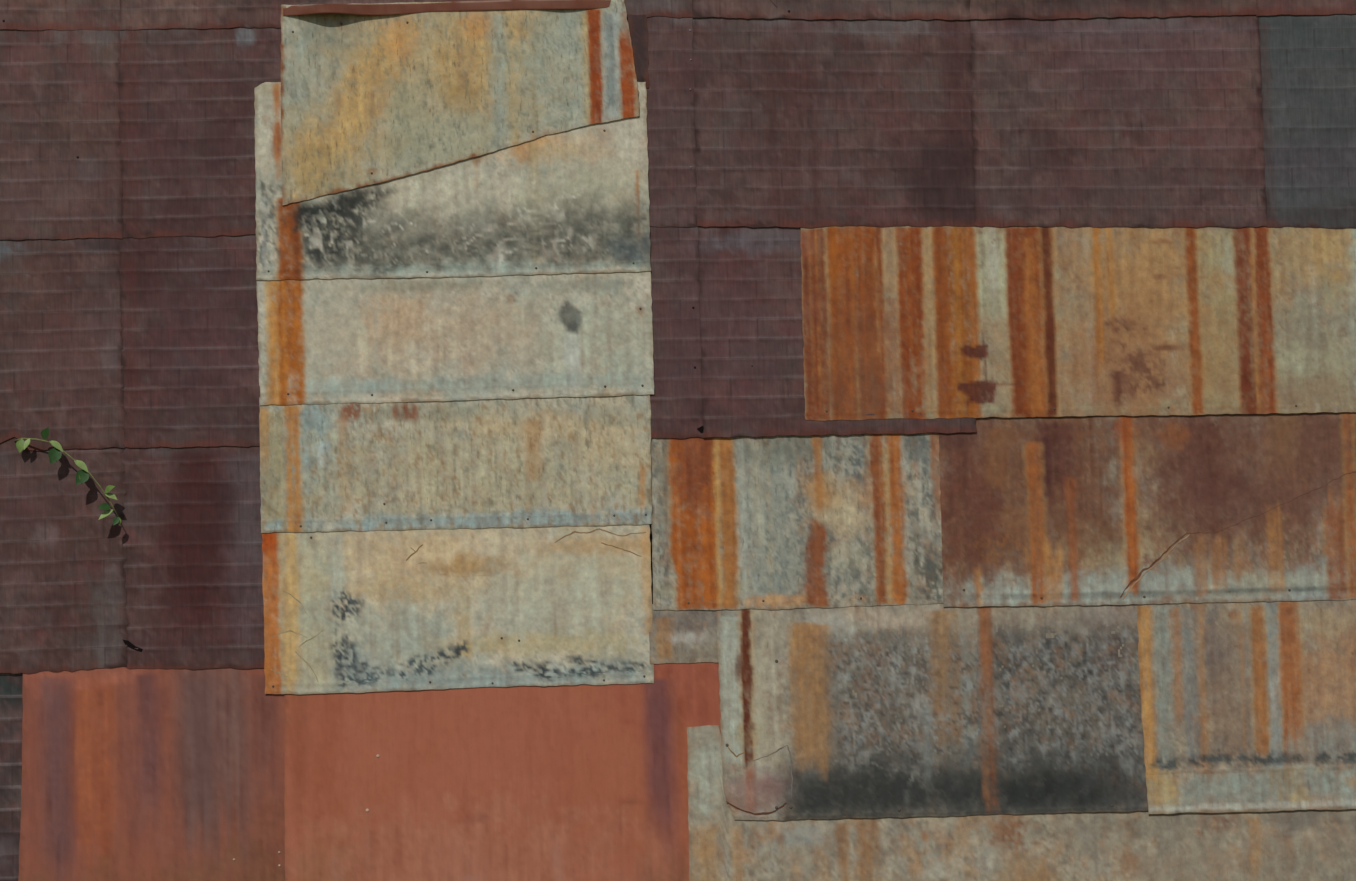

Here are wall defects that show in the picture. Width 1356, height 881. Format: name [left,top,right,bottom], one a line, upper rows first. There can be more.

rust [580,8,639,126]
rust [259,205,312,694]
rust [335,403,366,471]
rust [389,402,422,425]
rust [785,226,1356,881]
mould [326,582,473,693]
rust [636,437,771,820]